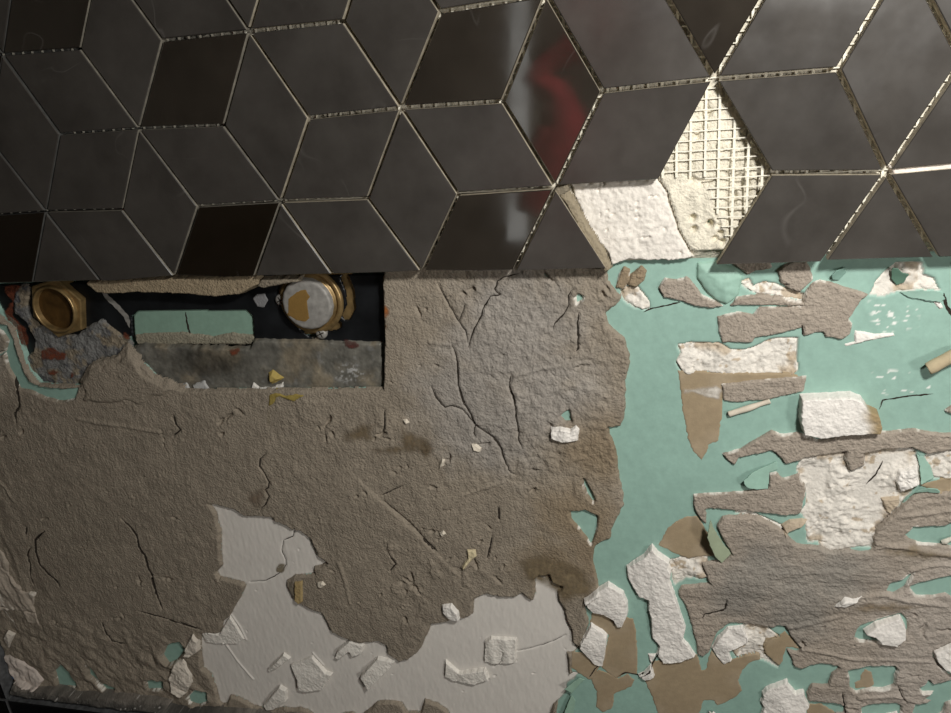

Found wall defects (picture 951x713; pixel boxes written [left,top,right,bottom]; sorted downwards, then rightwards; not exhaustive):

spalling [571,178,694,264]
crack [431,273,523,475]
spalling [621,285,650,309]
spalling [676,337,798,460]
spalling [741,278,803,299]
peeling [845,330,895,346]
spalling [871,261,938,295]
spalling [796,447,951,550]
crack [25,527,59,584]
crack [124,521,199,629]
spalling [202,504,800,713]
water stain [524,558,589,598]